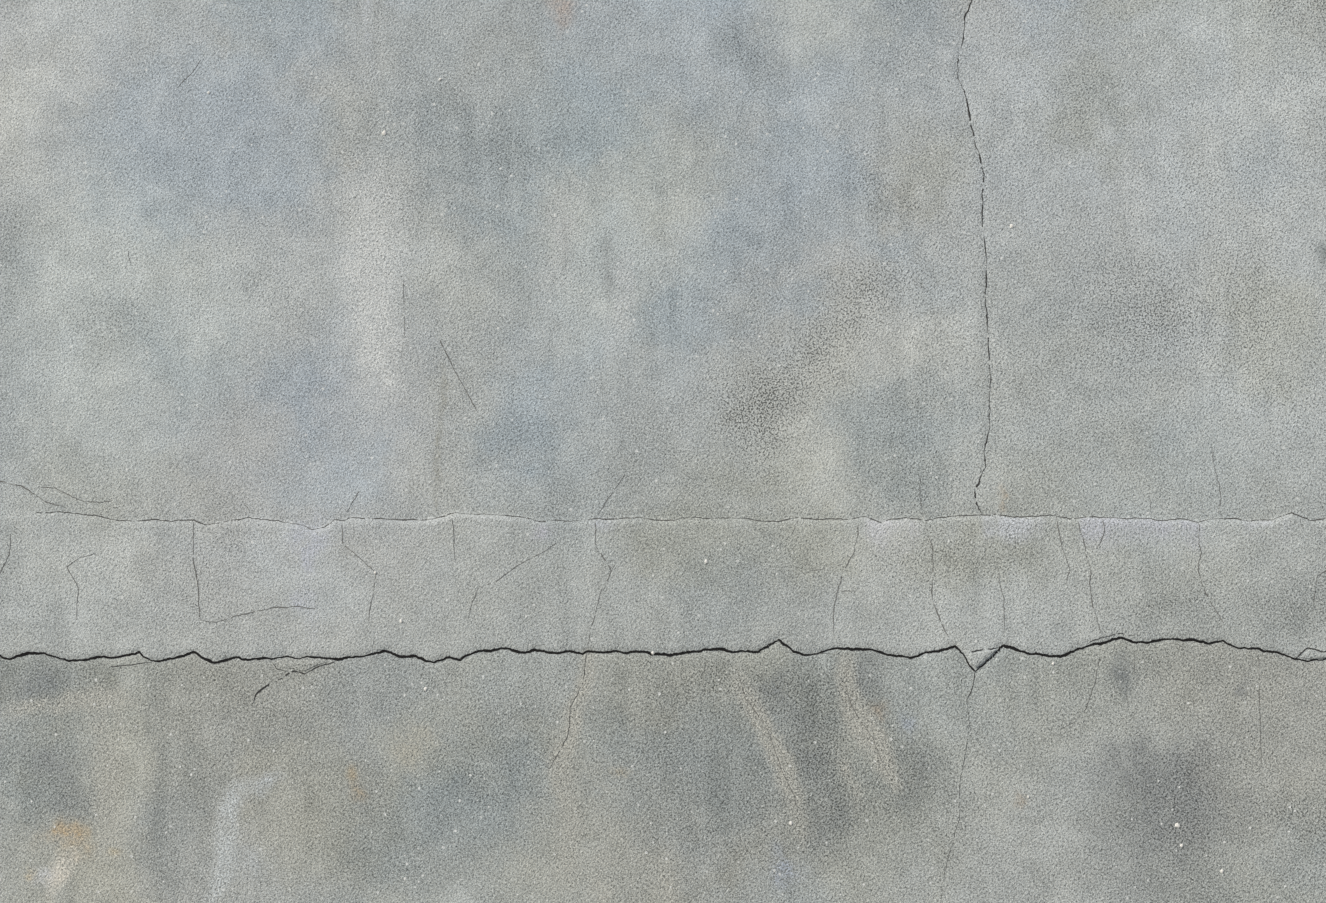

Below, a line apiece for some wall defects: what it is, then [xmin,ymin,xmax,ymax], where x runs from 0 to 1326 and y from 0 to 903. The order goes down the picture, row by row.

crack [961,0,972,46]
crack [957,59,985,227]
crack [0,239,1326,798]